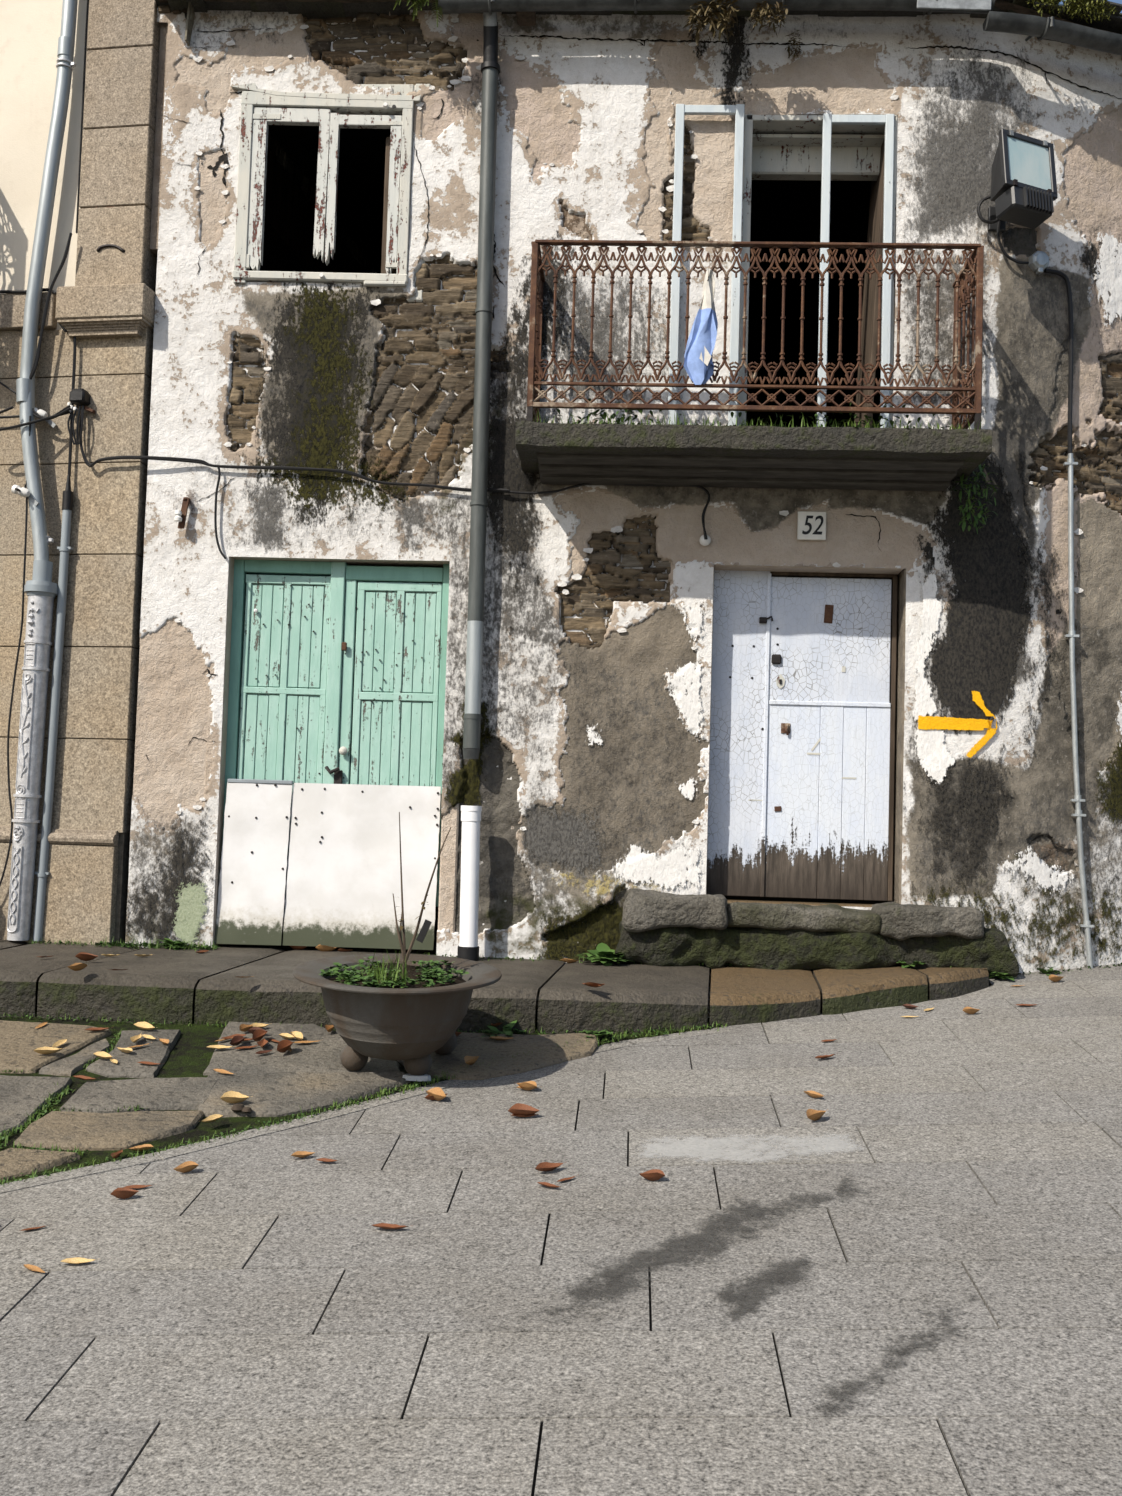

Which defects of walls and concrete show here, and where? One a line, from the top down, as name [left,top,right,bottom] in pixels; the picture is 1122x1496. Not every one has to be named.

flaking render [174,10,581,181]
spalling [560,202,593,240]
water stain [901,33,1045,255]
flaking render [224,334,271,452]
water stain [242,282,381,550]
water stain [392,496,424,555]
flaking render [361,253,512,503]
peeling [1028,108,1122,771]
peeling [439,490,930,940]
water stain [903,450,1083,896]
water stain [125,807,214,946]
water stain [549,1180,866,1319]